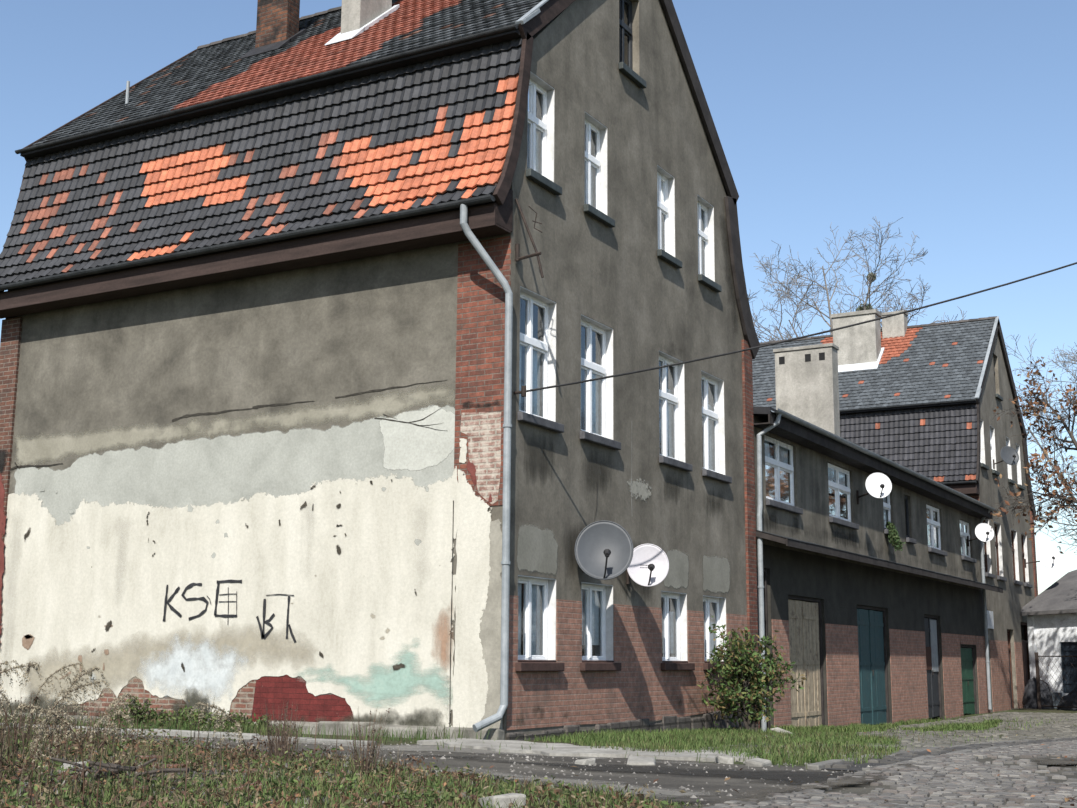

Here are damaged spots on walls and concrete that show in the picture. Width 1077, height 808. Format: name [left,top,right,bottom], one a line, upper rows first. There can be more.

crack [172,380,445,431]
peeling [0,387,503,729]
peeling [517,524,558,576]